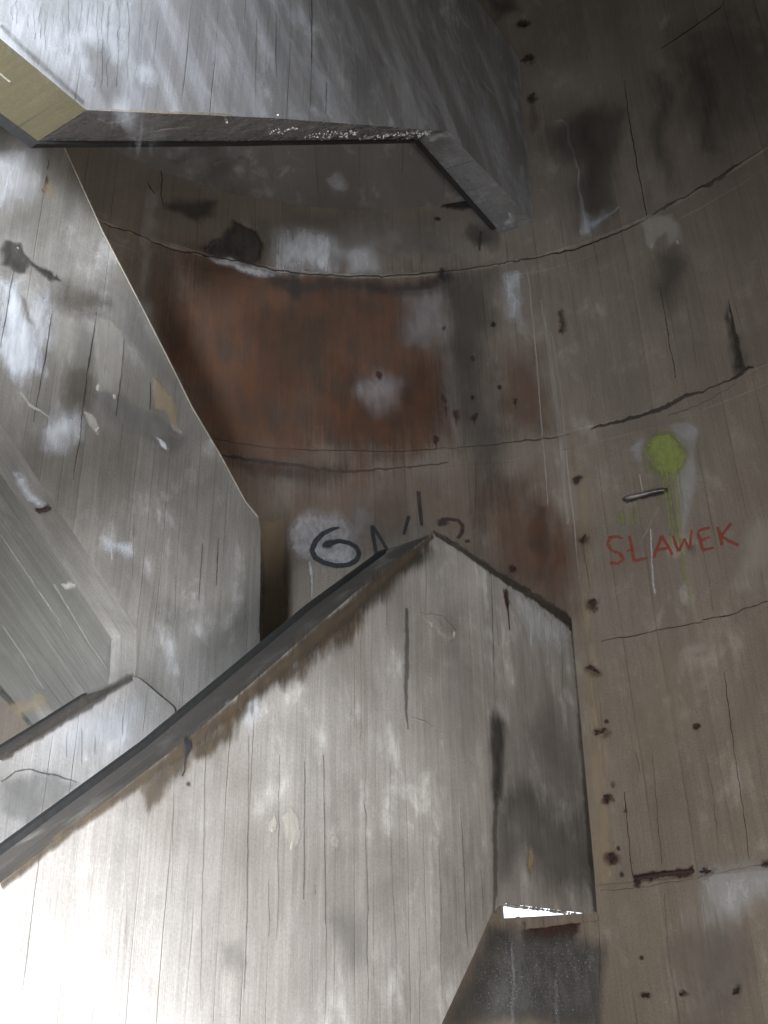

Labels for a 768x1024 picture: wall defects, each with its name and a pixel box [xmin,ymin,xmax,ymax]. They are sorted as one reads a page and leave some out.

damp [213,232,448,292]
crack [104,89,760,278]
corrosion [169,261,478,458]
crack [215,284,767,473]
crack [601,601,768,642]
damp [0,530,596,912]
corrosion [605,847,693,888]